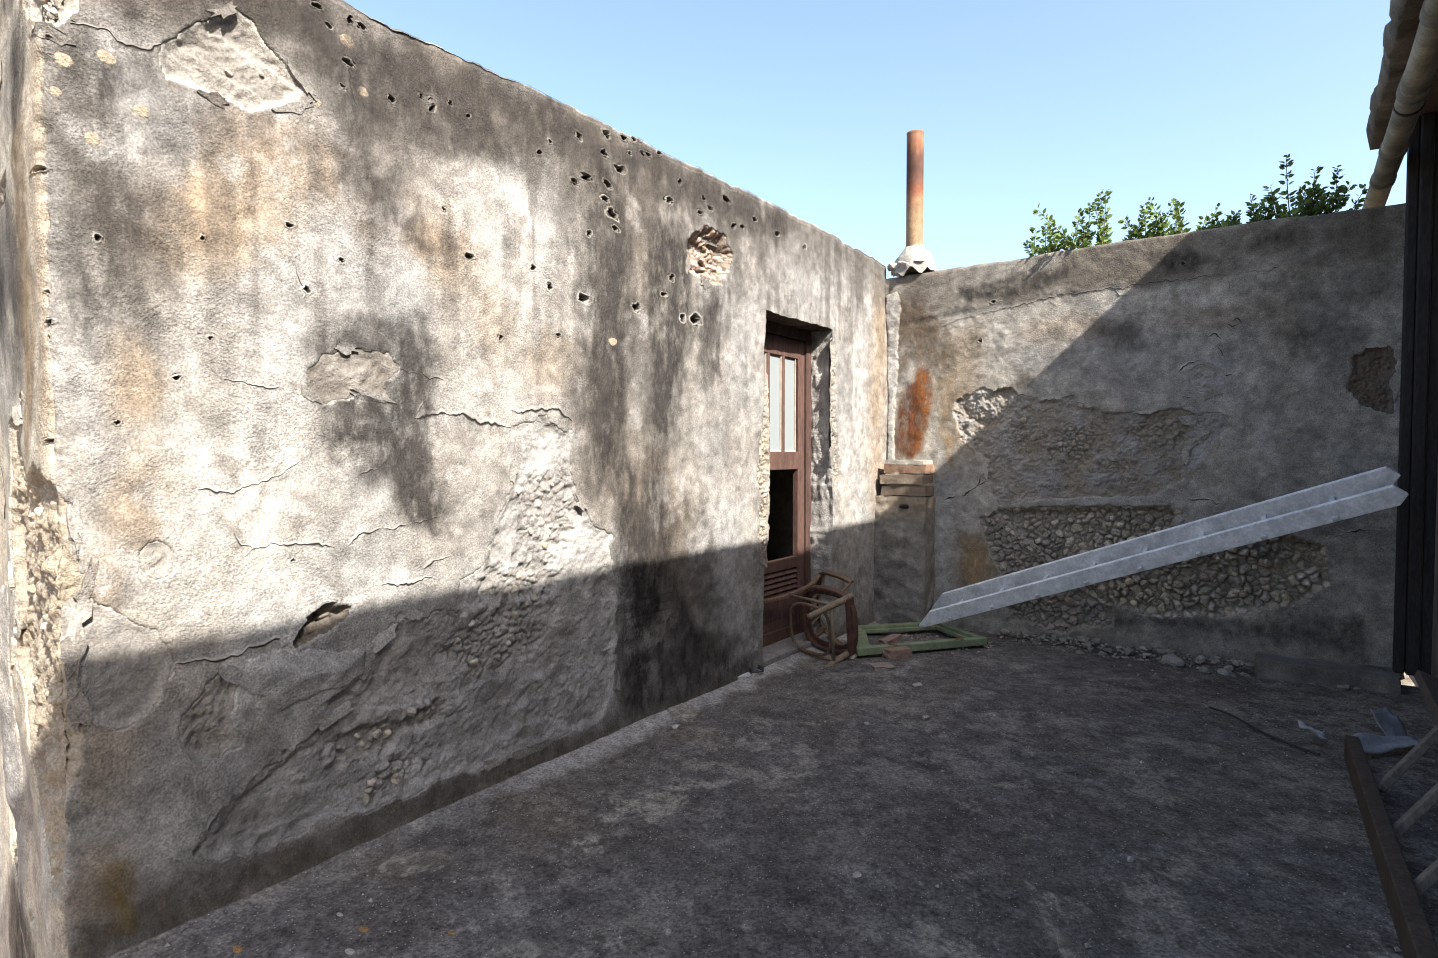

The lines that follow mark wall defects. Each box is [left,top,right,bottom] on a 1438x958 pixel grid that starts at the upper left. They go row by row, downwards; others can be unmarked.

leakage [99,63,120,100]
flaking render [158,0,317,115]
leakage [84,182,143,288]
crack [402,369,572,428]
leakage [265,0,788,714]
corrosion [896,367,958,455]
crack [198,461,299,495]
crack [234,516,438,556]
crack [382,556,449,587]
flaking render [1007,534,1333,635]
flaking render [8,405,173,897]
flaking render [194,415,621,862]